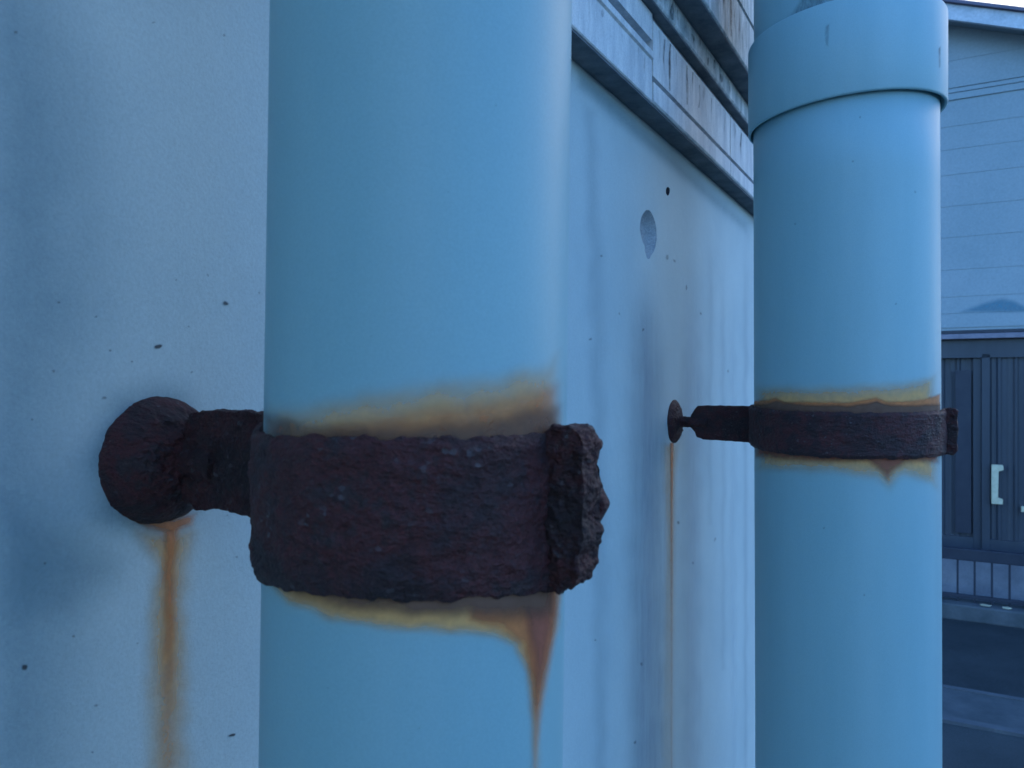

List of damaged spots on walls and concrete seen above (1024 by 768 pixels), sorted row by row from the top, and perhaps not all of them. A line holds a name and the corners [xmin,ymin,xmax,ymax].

spalling [640,210,657,259]
corrosion [267,383,554,440]
corrosion [754,384,940,414]
corrosion [757,448,937,477]
corrosion [147,517,192,728]
corrosion [279,588,556,709]